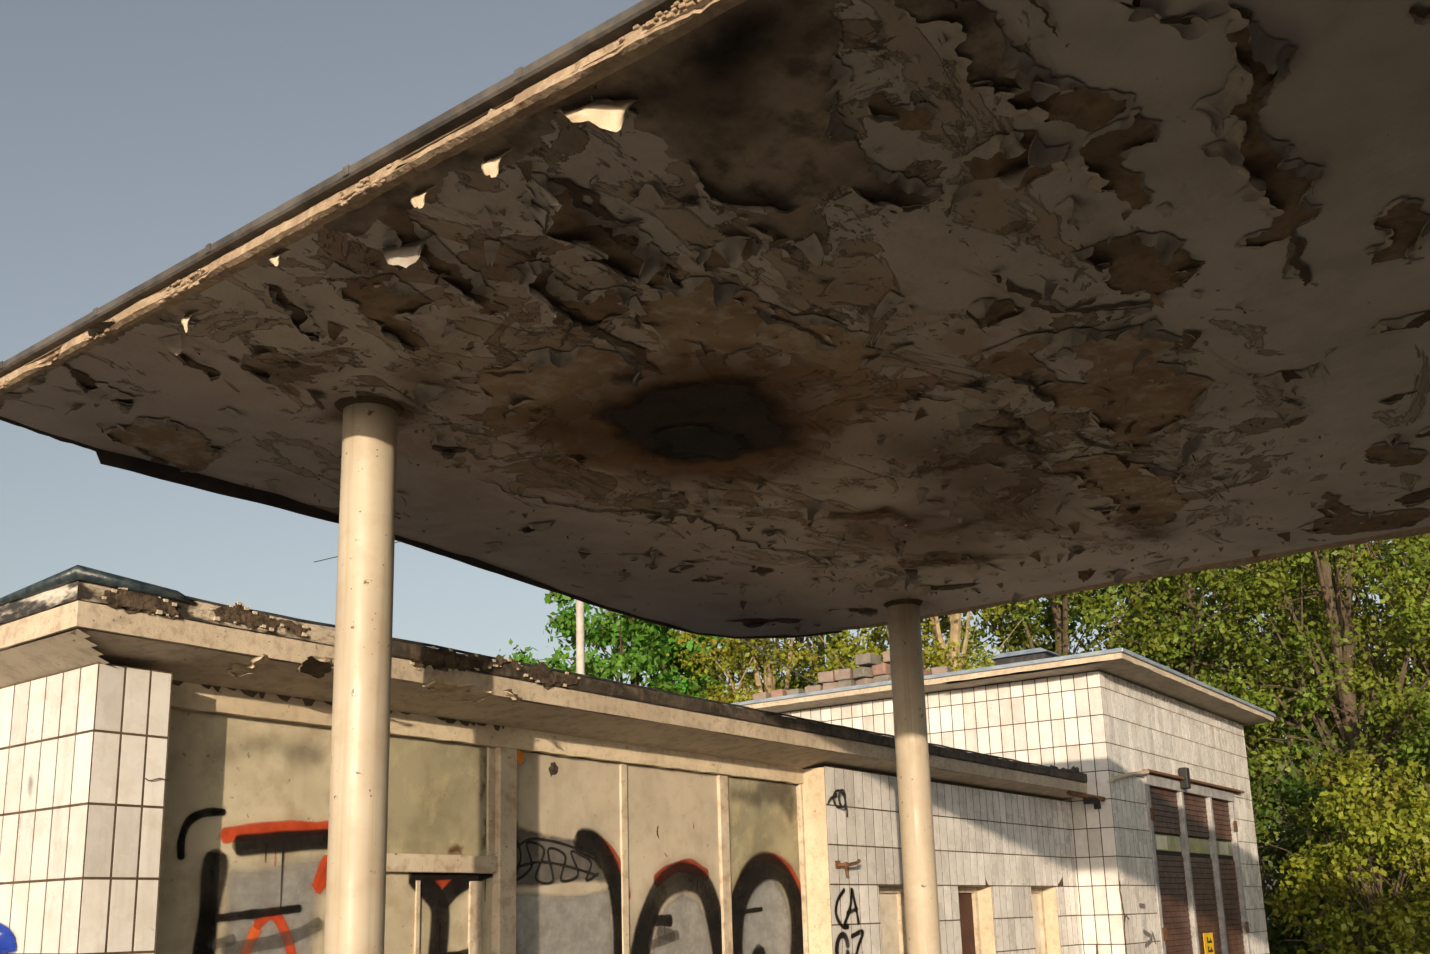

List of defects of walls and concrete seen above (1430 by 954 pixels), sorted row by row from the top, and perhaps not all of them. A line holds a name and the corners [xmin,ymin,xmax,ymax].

peeling [1118,0,1326,249]
peeling [308,0,1220,425]
peeling [1364,198,1430,265]
peeling [0,263,224,473]
water stain [600,380,793,464]
peeling [1360,427,1430,486]
peeling [519,356,1323,632]
peeling [1277,488,1430,547]
spalling [102,587,179,619]
spalling [211,602,308,638]
peeling [298,656,334,679]
spalling [410,646,580,690]